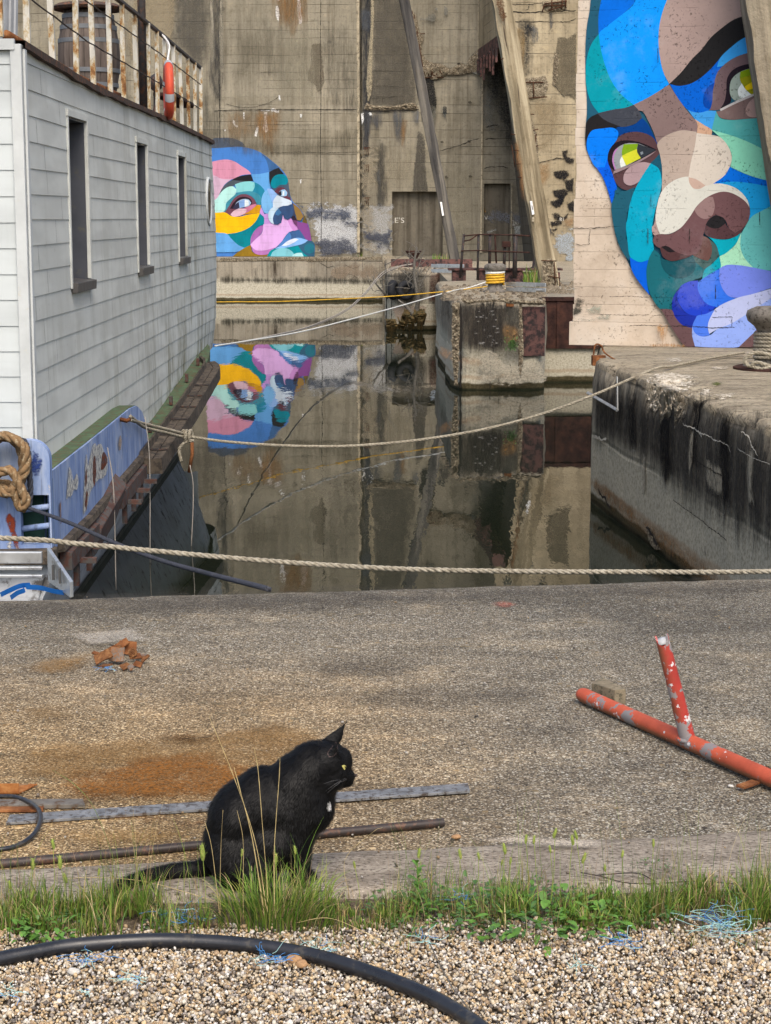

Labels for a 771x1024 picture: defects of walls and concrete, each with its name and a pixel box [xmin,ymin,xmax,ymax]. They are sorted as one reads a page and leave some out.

peeling [219,146,394,278]
water stain [595,382,771,553]
spalling [639,358,733,453]
crack [666,417,769,476]
crack [673,500,726,556]